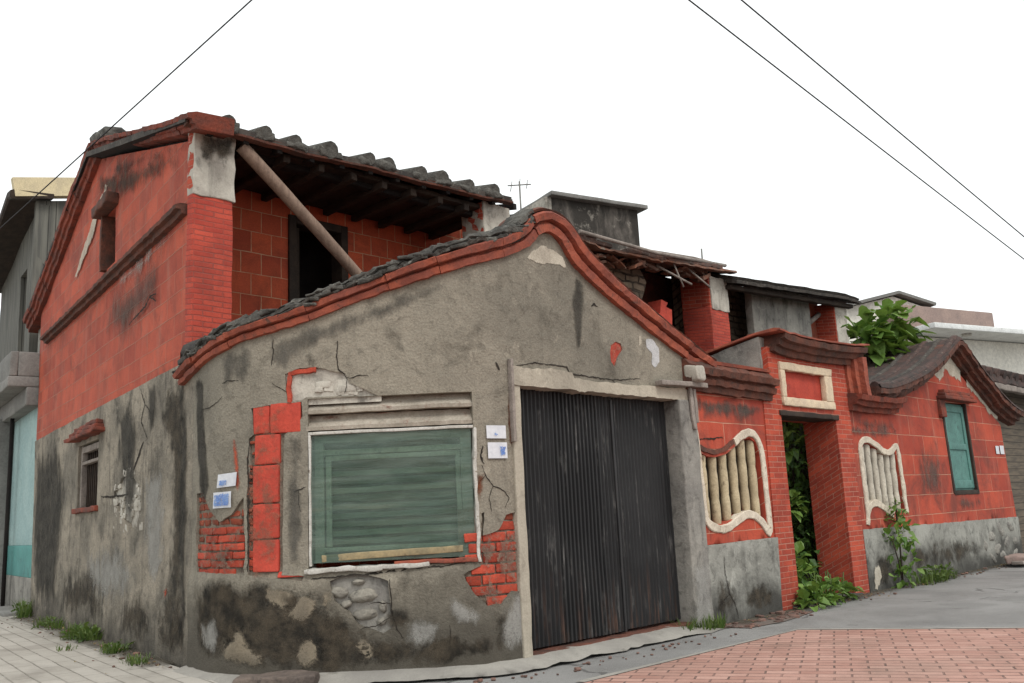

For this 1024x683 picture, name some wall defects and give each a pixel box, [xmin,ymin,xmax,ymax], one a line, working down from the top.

damp [99,157,163,199]
damp [75,219,97,277]
damp [573,279,583,346]
crack [336,341,368,392]
crack [495,362,640,383]
spalling [610,342,622,365]
spalling [113,467,143,533]
damp [146,381,208,635]
spalling [195,367,382,581]
crack [477,446,509,511]
spalling [458,511,518,607]
spalling [331,575,394,633]